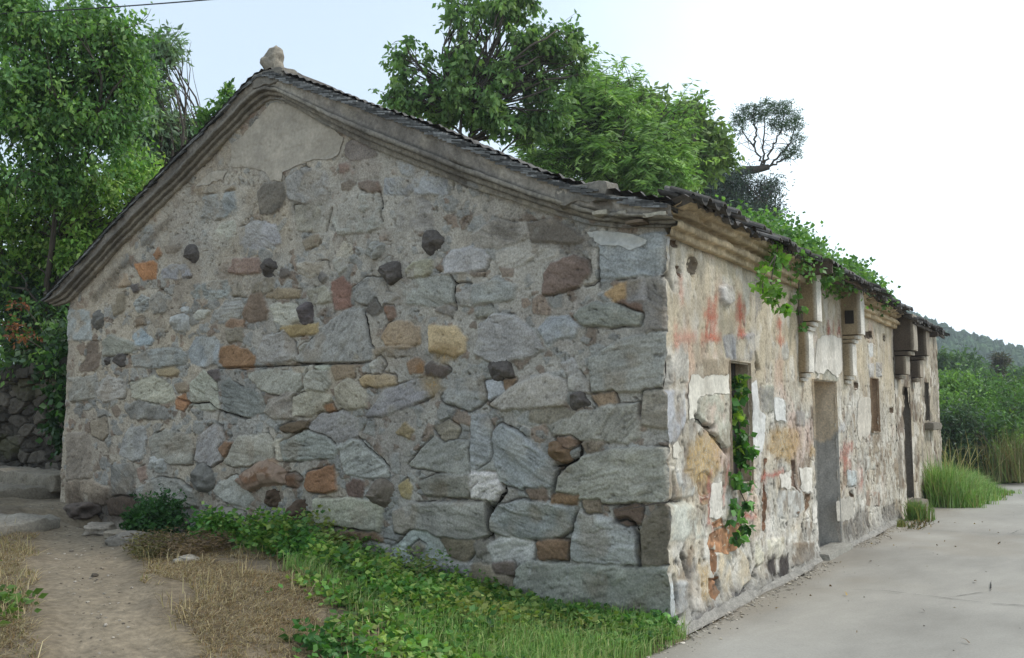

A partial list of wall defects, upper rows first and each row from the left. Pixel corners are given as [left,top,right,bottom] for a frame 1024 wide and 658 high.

flaking render [688,374,730,419]
flaking render [673,441,682,458]
flaking render [752,380,786,531]
flaking render [779,460,817,524]
flaking render [696,472,741,600]